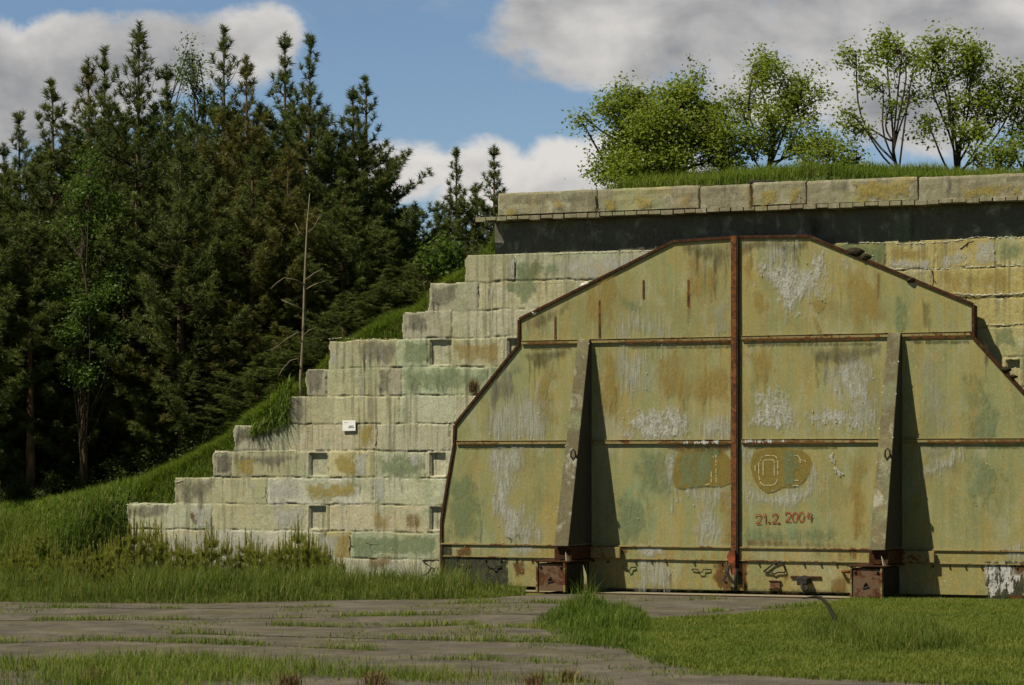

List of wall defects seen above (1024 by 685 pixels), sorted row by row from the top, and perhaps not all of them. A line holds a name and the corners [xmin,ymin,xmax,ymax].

peeling [759,248,831,319]
leakage [360,342,394,397]
peeling [745,355,880,443]
peeling [623,408,730,447]
peeling [984,561,1024,599]